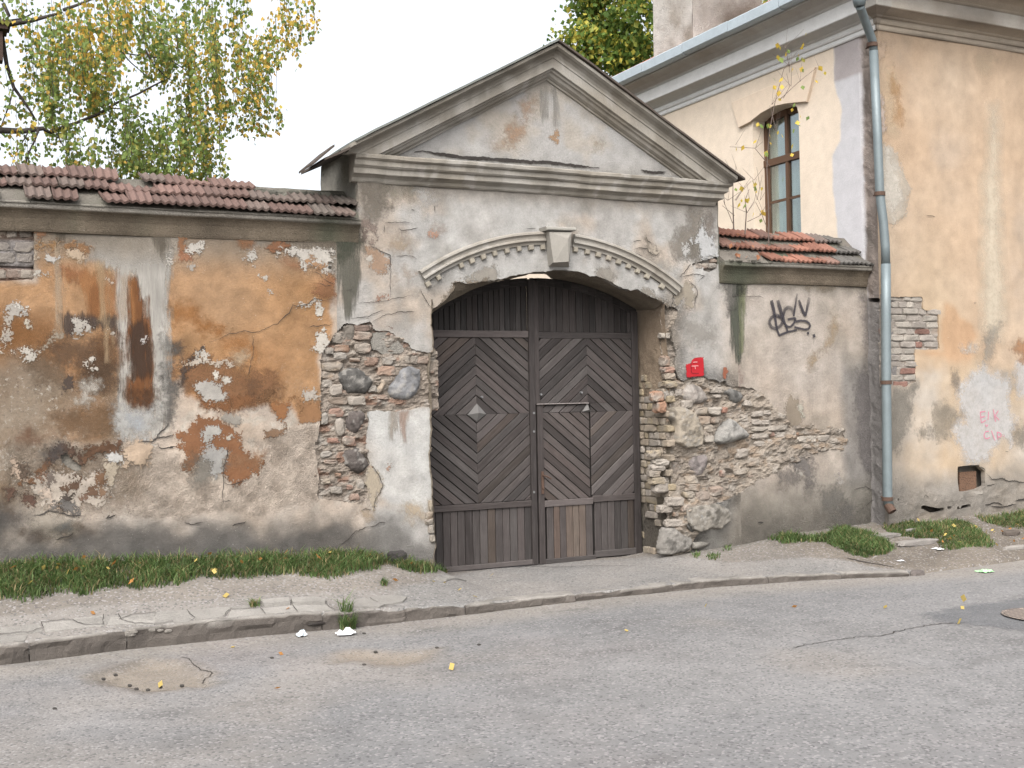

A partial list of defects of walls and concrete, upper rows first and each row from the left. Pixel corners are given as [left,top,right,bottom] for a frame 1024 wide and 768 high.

crack [415,150,599,168]
spalling [0,231,94,281]
peeling [0,302,94,363]
water stain [17,236,281,489]
peeling [179,346,246,479]
peeling [276,245,337,275]
crack [211,207,435,375]
spalling [263,297,439,518]
water stain [724,283,746,353]
spalling [638,280,848,556]
spalling [878,294,941,387]
peeling [1,439,155,518]